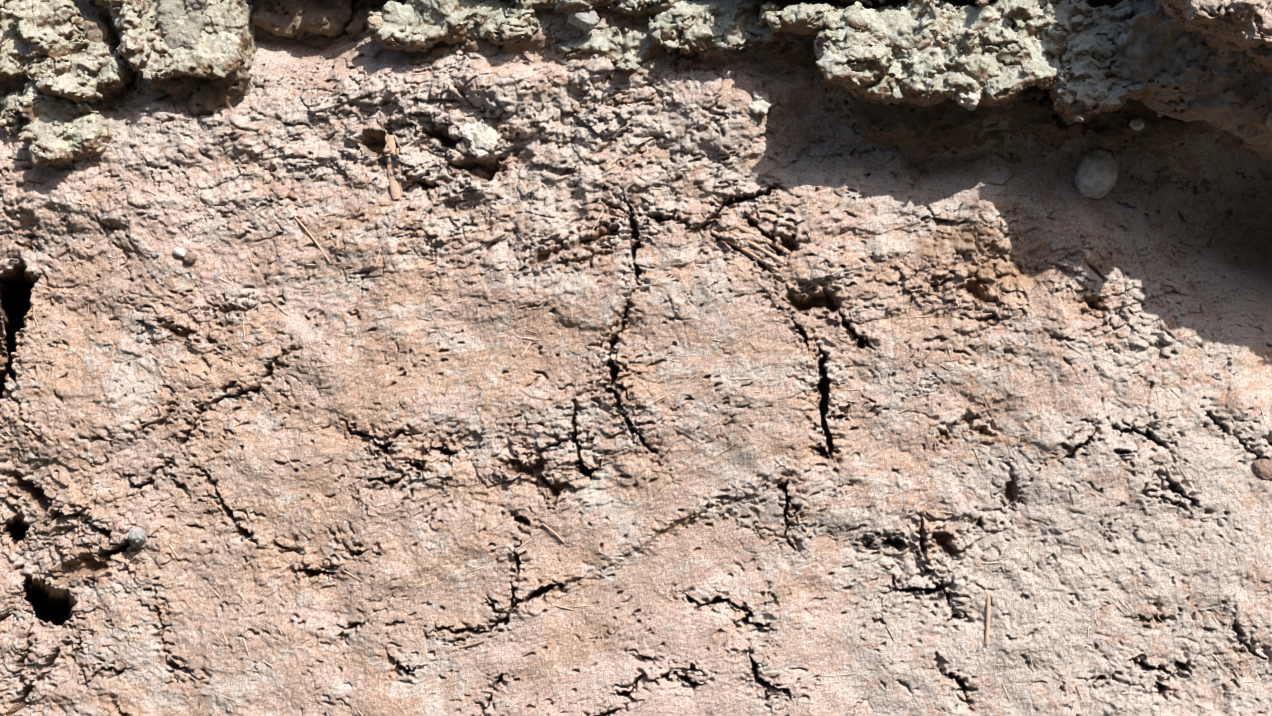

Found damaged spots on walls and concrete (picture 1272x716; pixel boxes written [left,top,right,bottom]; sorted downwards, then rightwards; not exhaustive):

crack [515,187,782,477]
crack [837,306,874,349]
crack [0,337,49,447]
crack [343,422,455,485]
crack [432,323,846,643]
crack [0,611,128,716]
crack [153,584,202,680]
crack [385,648,416,674]
crack [595,650,700,716]
crack [687,592,790,698]